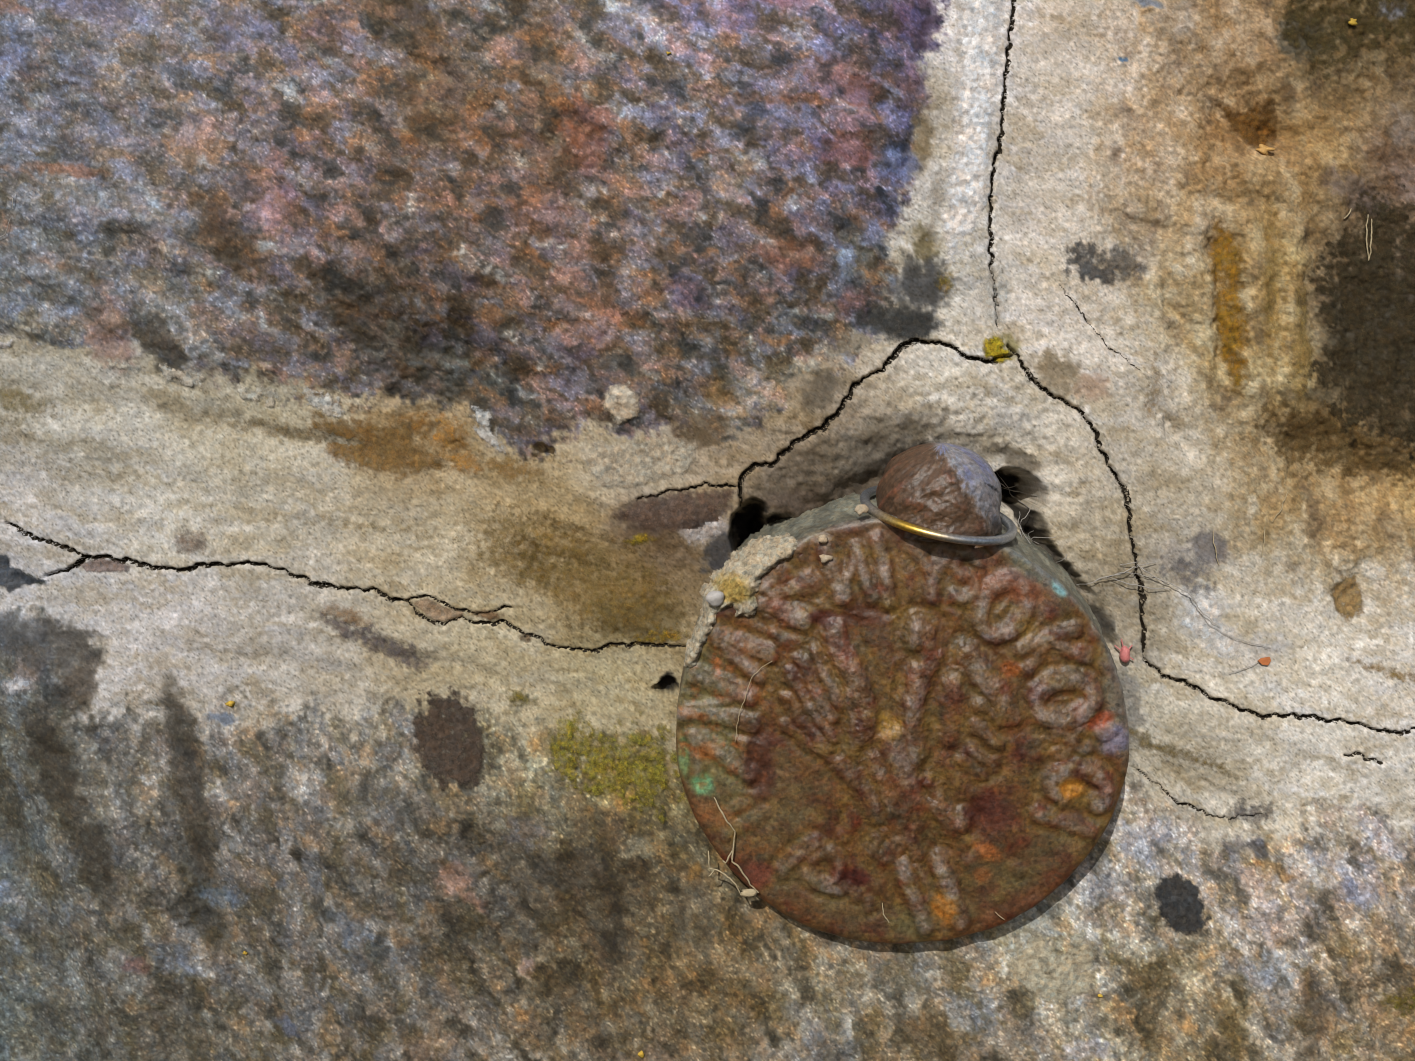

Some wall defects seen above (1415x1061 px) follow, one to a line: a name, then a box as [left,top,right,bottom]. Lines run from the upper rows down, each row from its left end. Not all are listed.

crack [637,0,1415,765]
crack [10,522,685,653]
crack [1138,769,1262,820]